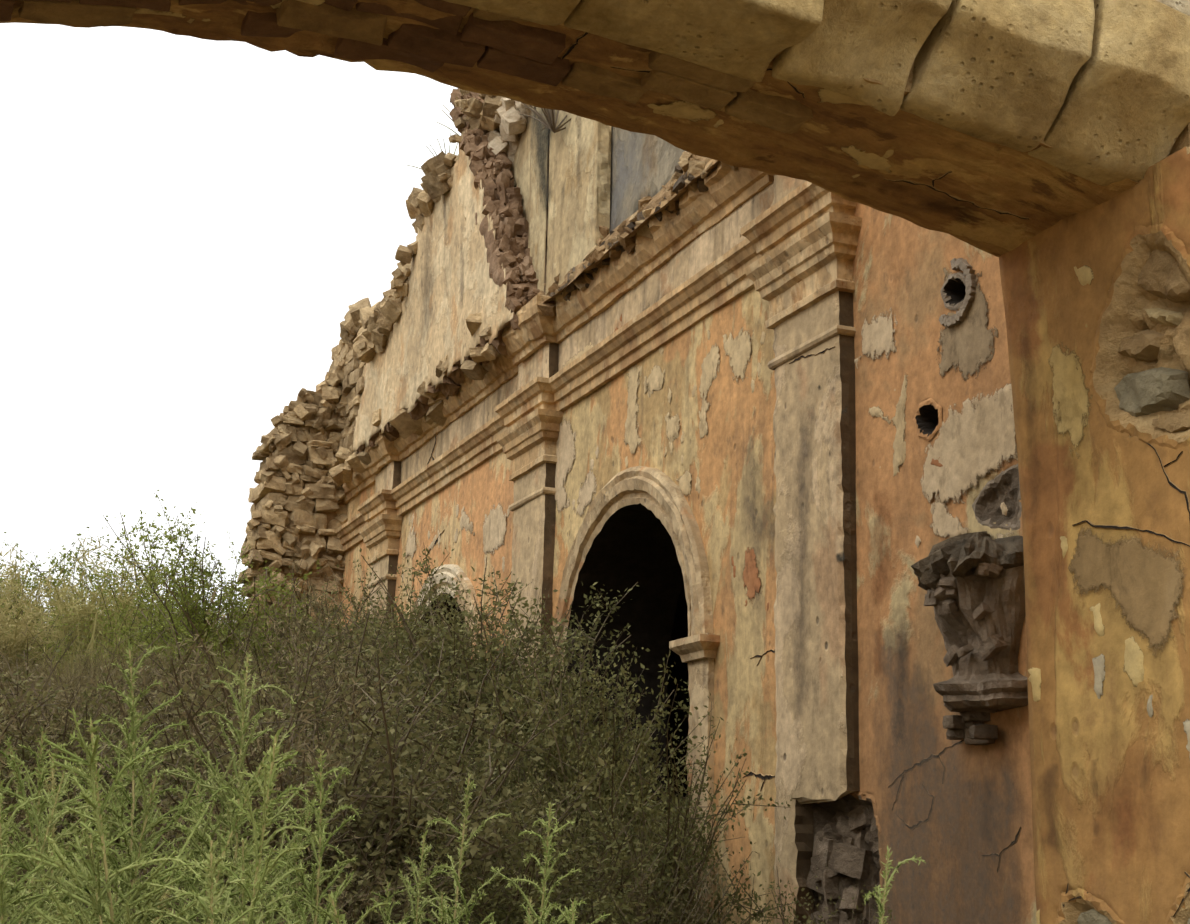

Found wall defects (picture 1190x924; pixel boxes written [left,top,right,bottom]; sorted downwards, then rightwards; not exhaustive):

flaking render [692,327,766,439]
flaking render [854,308,898,369]
spalling [1048,224,1190,459]
flaking render [402,502,510,578]
flaking render [731,547,769,611]
flaking render [920,383,1022,539]
flaking render [1060,520,1184,687]
crack [1138,441,1190,547]
flaking render [1092,654,1105,699]
spalling [806,792,887,924]
spalling [1055,888,1125,924]
spalling [1165,876,1190,924]